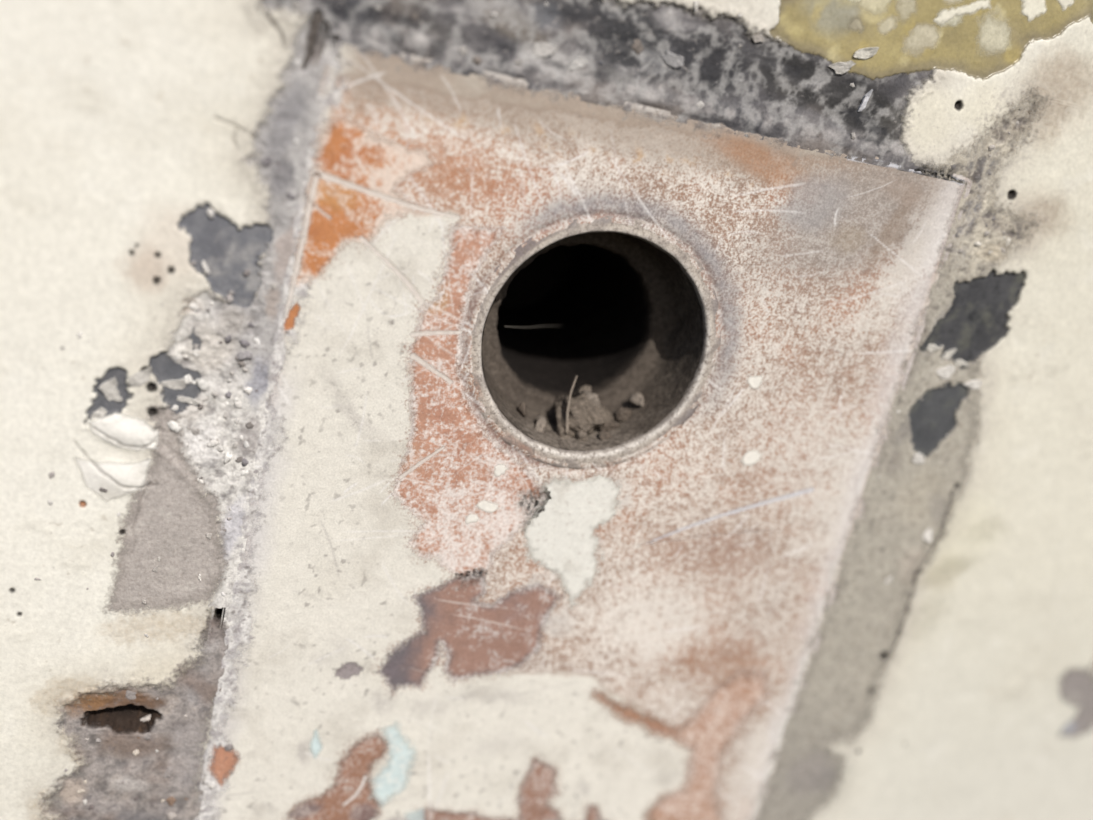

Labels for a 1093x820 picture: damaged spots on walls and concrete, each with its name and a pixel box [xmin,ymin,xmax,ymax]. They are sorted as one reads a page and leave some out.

spalling [44,22,332,820]
spalling [260,0,1093,820]
crack [888,490,953,659]